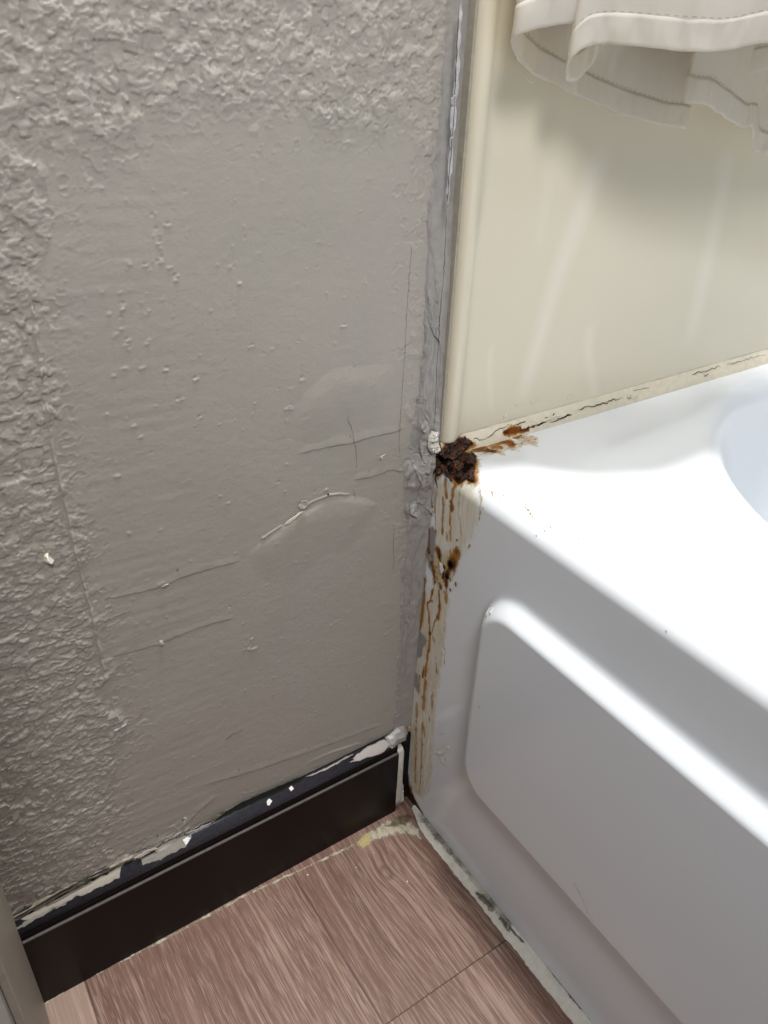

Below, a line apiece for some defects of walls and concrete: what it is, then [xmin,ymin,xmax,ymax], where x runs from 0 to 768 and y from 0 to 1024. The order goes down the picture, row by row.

crack [297,12,459,454]
rust [471,426,536,454]
rust [406,473,470,815]
peeling [13,847,158,921]